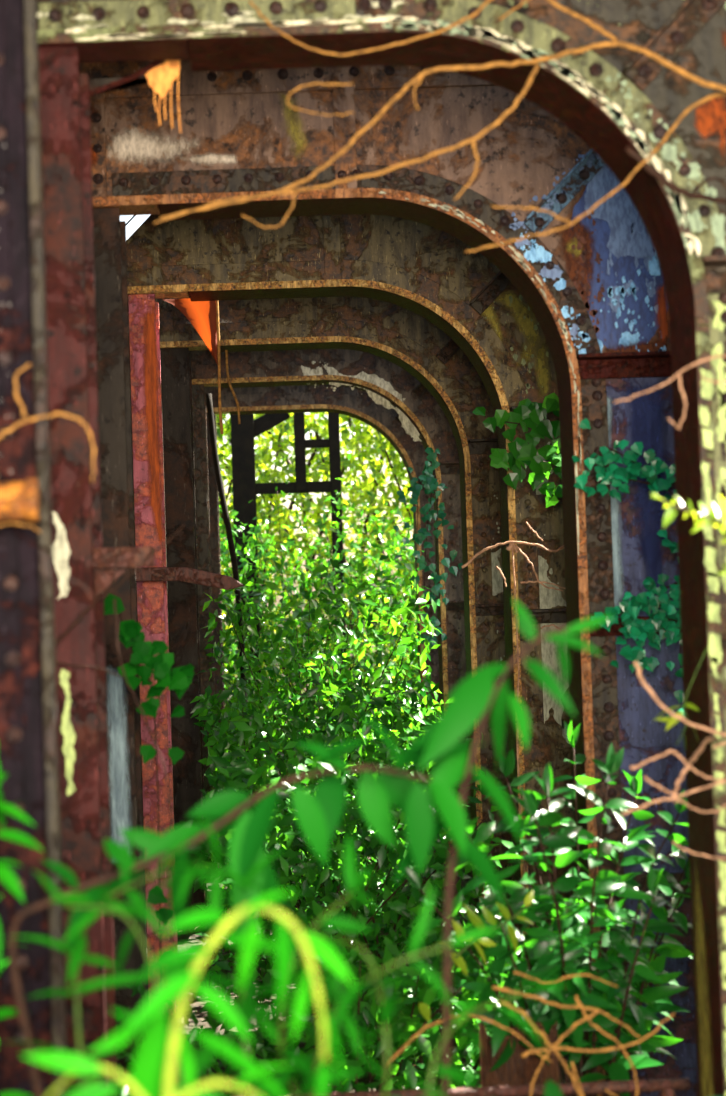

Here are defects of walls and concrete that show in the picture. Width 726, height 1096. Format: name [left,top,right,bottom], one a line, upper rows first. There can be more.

peeling [65,0,726,256]
rust [695,97,726,148]
peeling [405,153,668,555]
peeling [699,300,726,679]
peeling [491,522,503,596]
peeling [538,555,566,609]
peeling [540,622,571,745]
peeling [713,692,724,791]
peeling [716,806,726,989]